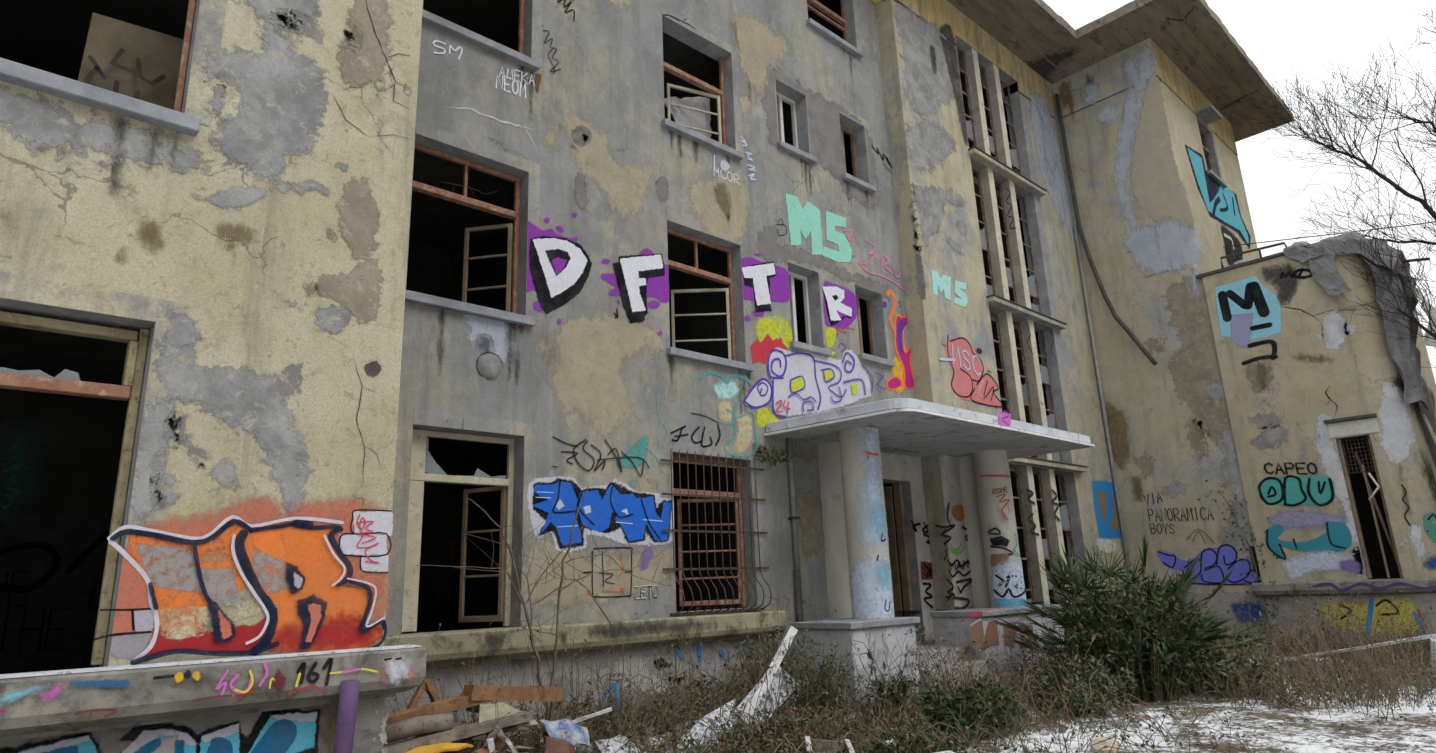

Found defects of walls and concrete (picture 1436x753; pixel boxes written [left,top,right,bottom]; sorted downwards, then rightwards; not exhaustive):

peeling [0,0,395,335]
crack [333,0,411,139]
crack [448,107,539,151]
peeling [1344,322,1357,336]
peeling [130,307,314,523]